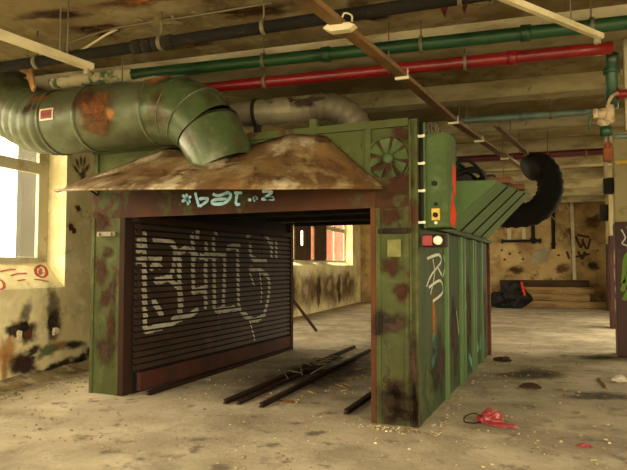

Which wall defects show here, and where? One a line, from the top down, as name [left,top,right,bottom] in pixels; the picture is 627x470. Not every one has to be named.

water stain [293,273,354,307]
flaking render [6,305,36,343]
flaking render [47,292,60,339]